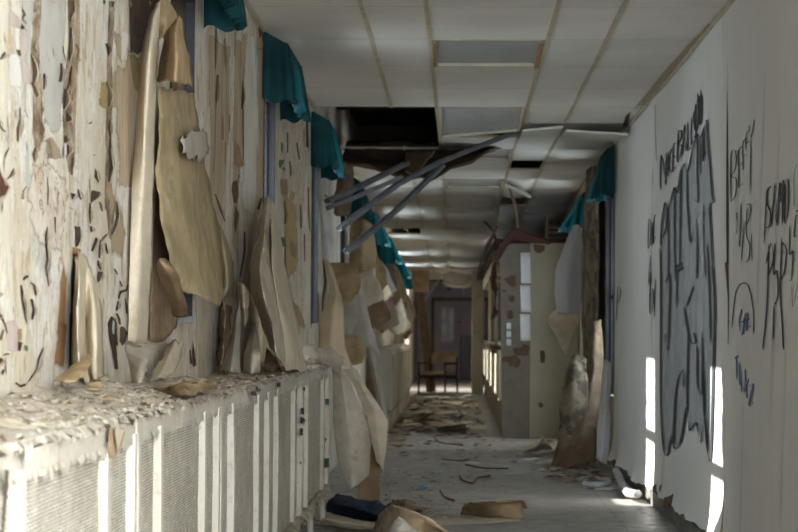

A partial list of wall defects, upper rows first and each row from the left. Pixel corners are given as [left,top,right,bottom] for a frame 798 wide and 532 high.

flaking render [9,0,81,251]
spalling [72,226,84,256]
spalling [108,269,133,369]
flaking render [91,0,160,299]
flaking render [208,10,267,263]
spalling [280,119,310,335]
peeling [502,344,530,368]